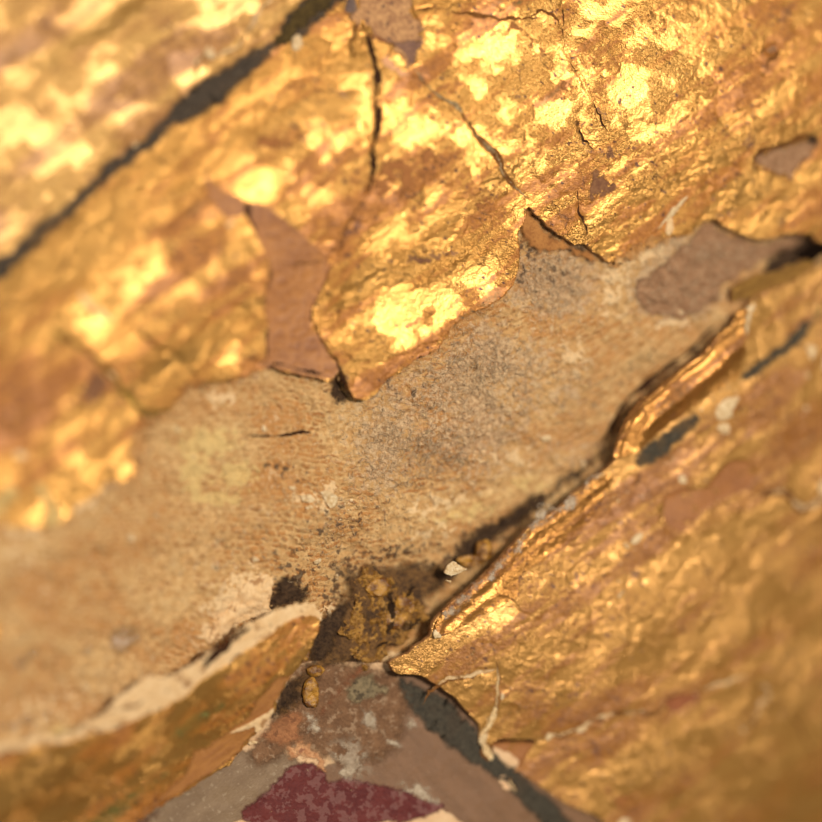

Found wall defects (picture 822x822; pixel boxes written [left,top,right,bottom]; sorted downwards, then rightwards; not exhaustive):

crack [336,25,382,260]
crack [415,70,527,199]
spalling [747,130,818,180]
crack [51,328,169,420]
crack [242,429,311,437]
peeling [0,174,822,772]
damp [559,496,576,512]
crack [757,487,822,516]
crack [423,662,501,761]
crack [540,705,664,741]